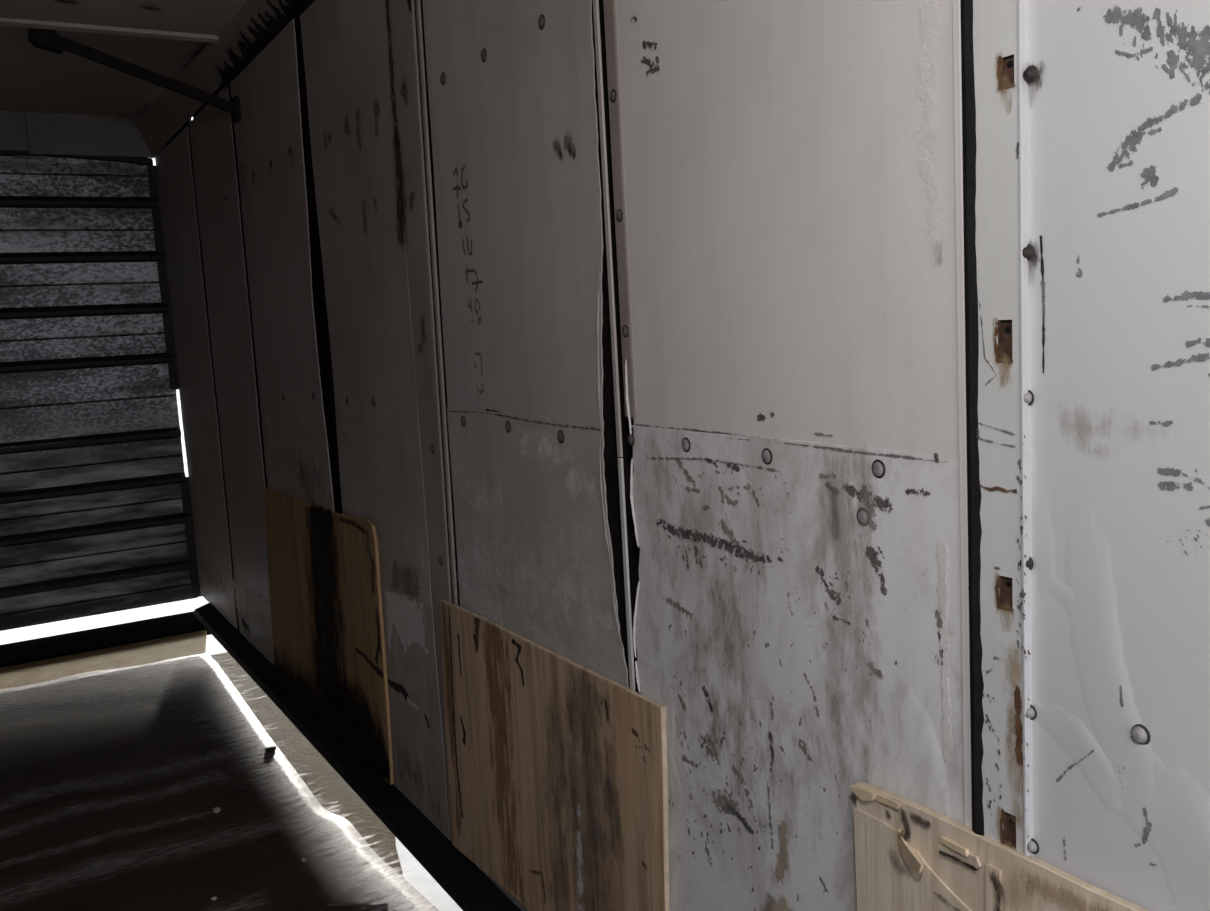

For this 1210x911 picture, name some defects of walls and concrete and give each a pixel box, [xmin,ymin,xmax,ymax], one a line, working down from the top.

mould [214,0,313,90]
corrosion [996,56,1015,90]
peeling [1103,5,1210,189]
corrosion [994,323,1013,384]
peeling [339,517,429,656]
corrosion [995,577,1014,618]
leakage [766,702,788,883]
leakage [886,809,930,842]
corrosion [982,661,1023,849]
leakage [939,850,1016,911]